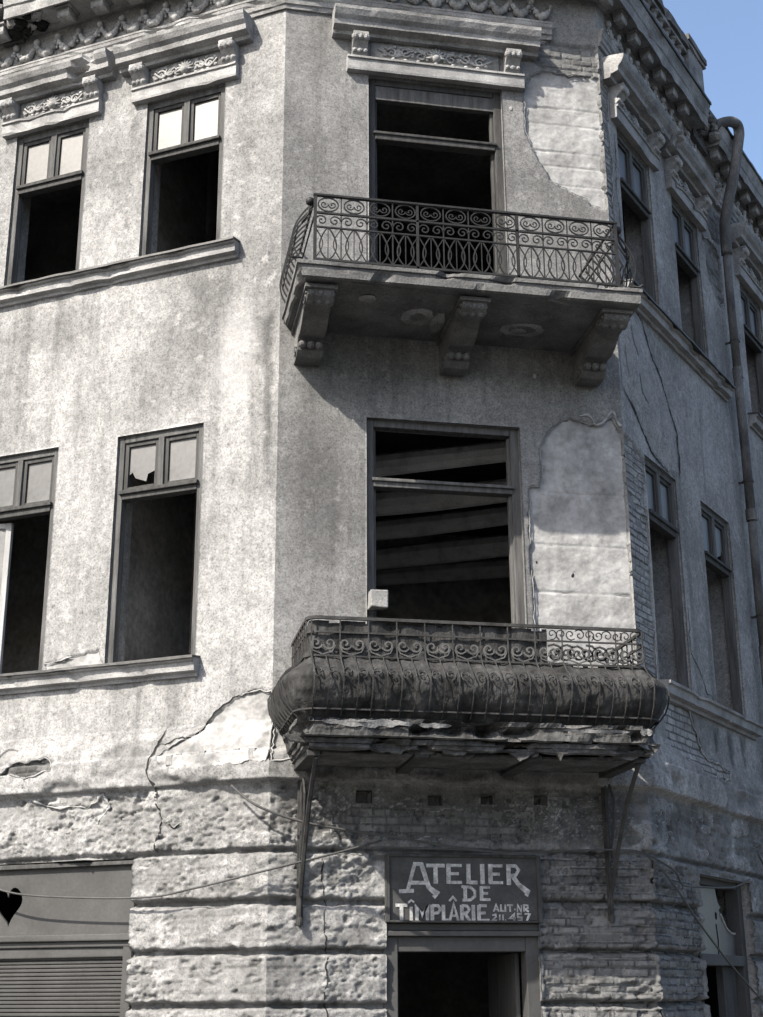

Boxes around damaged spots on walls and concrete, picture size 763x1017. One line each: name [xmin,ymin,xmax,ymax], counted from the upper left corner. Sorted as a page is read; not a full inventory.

spalling [523,69,607,210]
crack [624,312,681,473]
spalling [529,410,637,668]
crack [145,689,257,852]
spalling [157,689,308,769]
spalling [322,718,451,755]
spalling [483,741,539,762]
spalling [552,747,568,761]
spalling [563,702,732,783]
crack [321,858,329,1017]